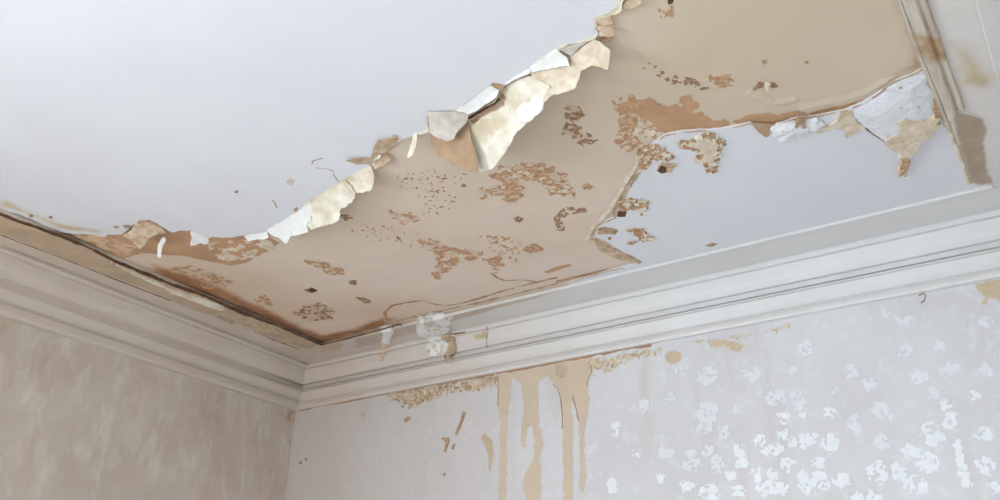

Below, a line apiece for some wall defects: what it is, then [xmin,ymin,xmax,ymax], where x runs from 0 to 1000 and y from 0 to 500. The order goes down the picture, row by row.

peeling [113,0,941,363]
water stain [973,279,1000,305]
peeling [586,345,667,376]
water stain [664,350,682,365]
water stain [708,339,745,353]
peeling [383,373,499,423]
water stain [481,357,593,500]
peeling [658,338,1000,500]